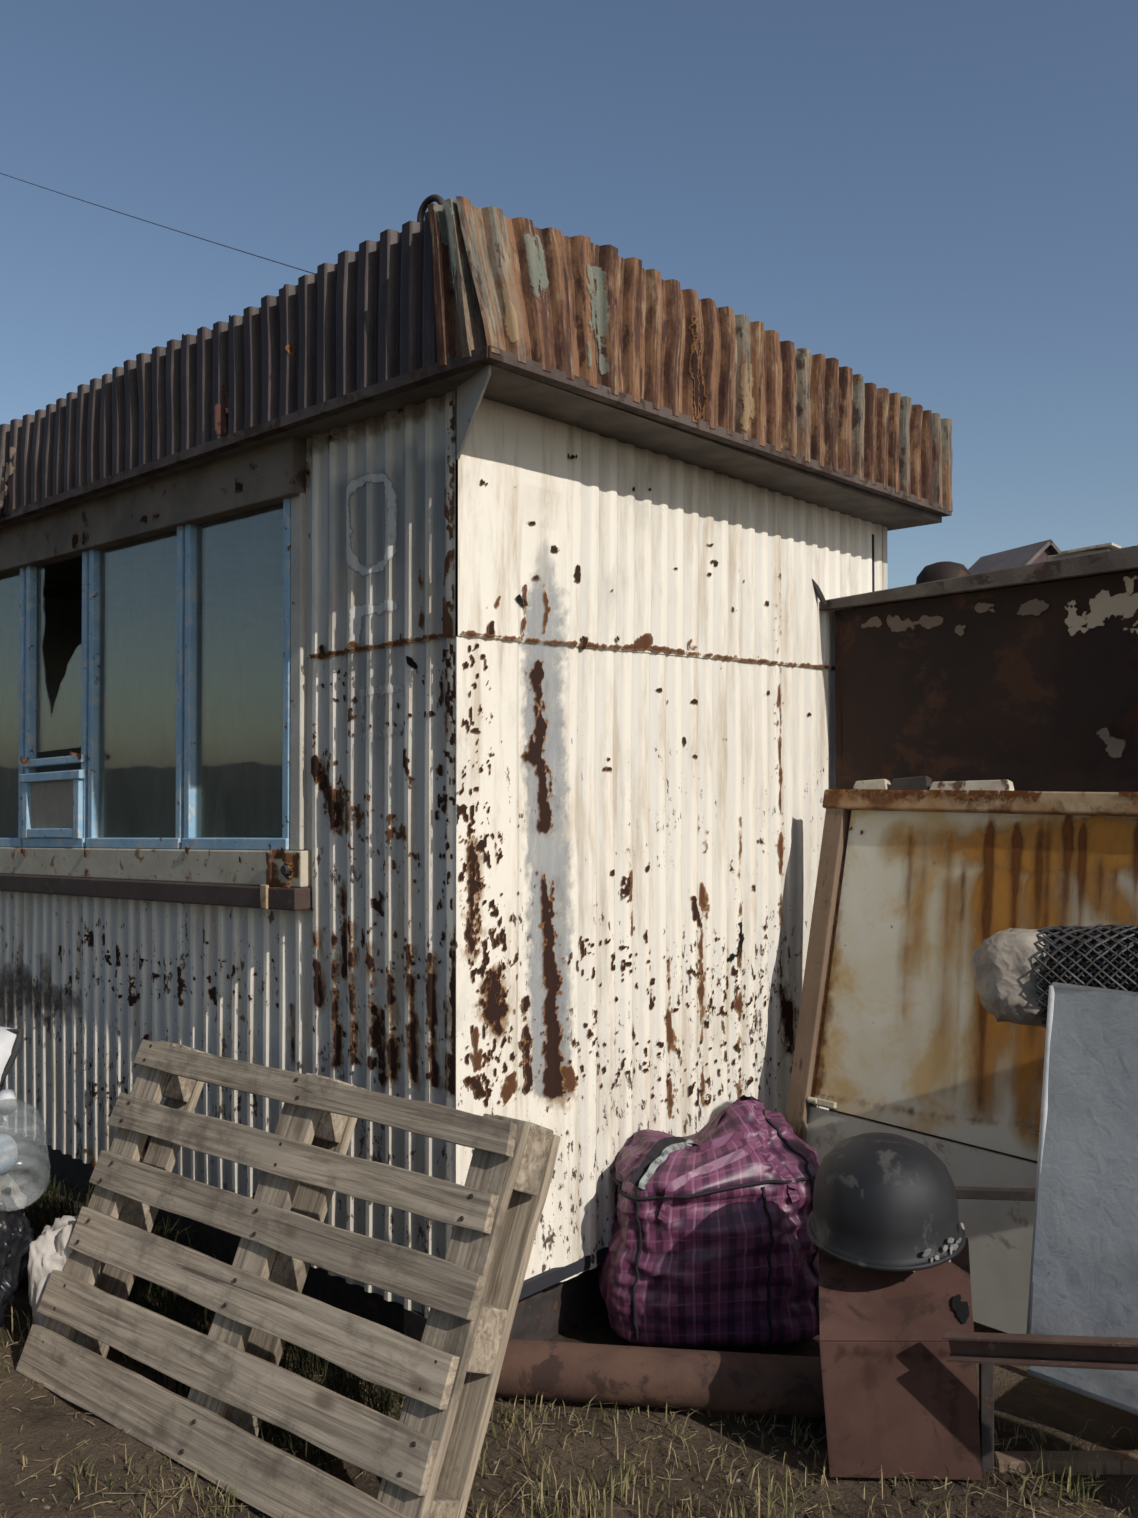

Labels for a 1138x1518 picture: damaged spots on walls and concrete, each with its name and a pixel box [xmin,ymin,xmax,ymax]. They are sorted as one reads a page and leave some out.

corrosion [689,316,708,420]
corrosion [740,363,757,431]
peeling [860,602,997,636]
peeling [1017,573,1138,636]
corrosion [309,401,835,1118]
peeling [1092,728,1126,758]
corrosion [266,846,300,887]
corrosion [78,929,295,1063]
corrosion [831,789,1138,1144]
corrosion [81,1054,128,1135]